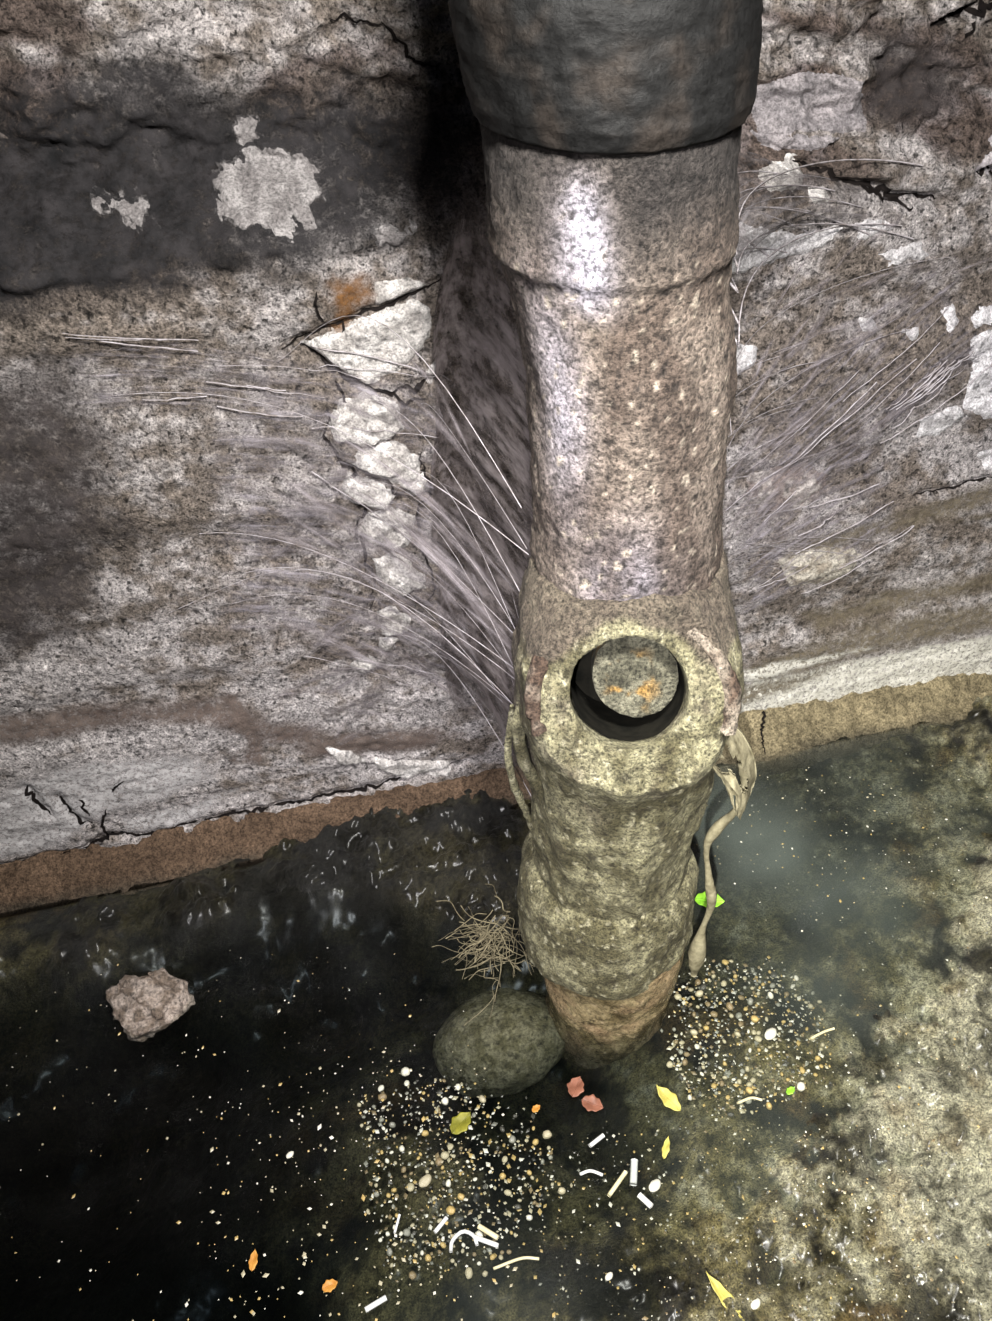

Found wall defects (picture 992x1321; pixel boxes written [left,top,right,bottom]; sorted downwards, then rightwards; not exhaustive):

crack [930,0,992,38]
crack [792,160,936,211]
crack [976,165,992,177]
spalling [424,361,436,384]
peeling [916,304,992,437]
spalling [300,277,432,674]
crack [282,279,460,610]
peeling [976,448,992,470]
crack [24,777,401,854]